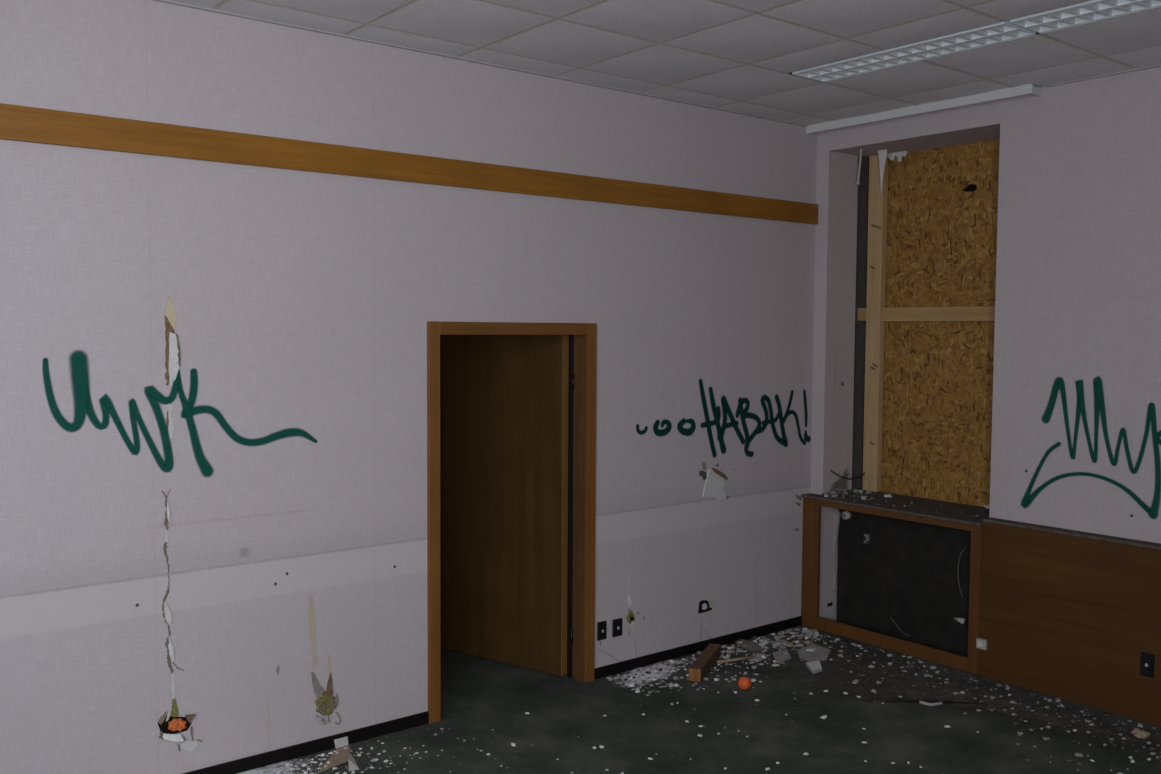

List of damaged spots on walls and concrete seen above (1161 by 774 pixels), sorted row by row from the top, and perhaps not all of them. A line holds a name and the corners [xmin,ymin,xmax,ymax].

flaking render [699,462,735,502]
crack [162,489,184,705]
spalling [158,698,202,752]
spalling [311,672,341,725]